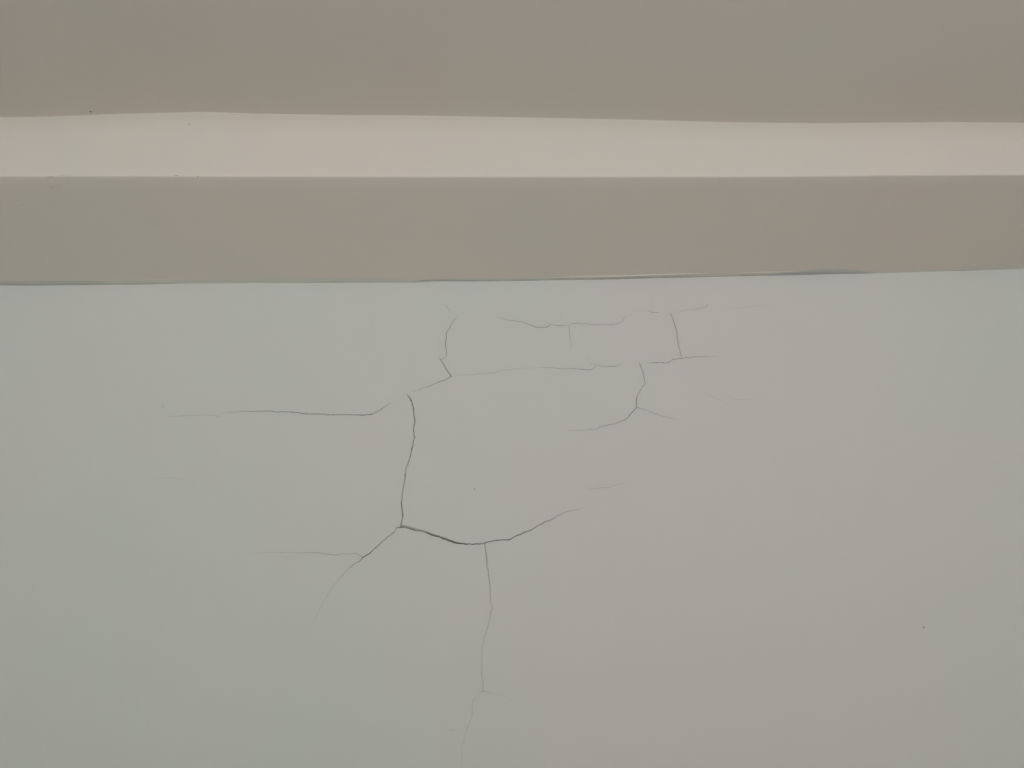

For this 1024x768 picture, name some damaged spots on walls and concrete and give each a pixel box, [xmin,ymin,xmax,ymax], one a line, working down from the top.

crack [399,501,544,557]